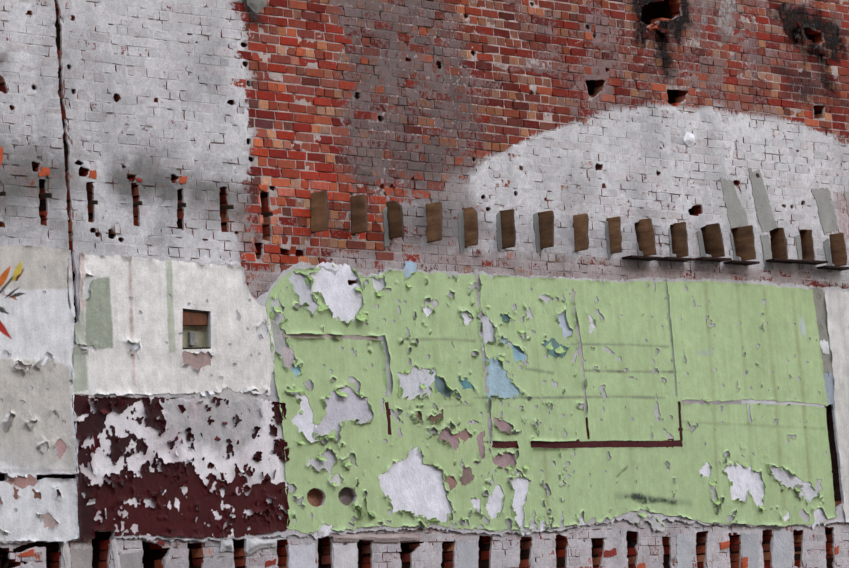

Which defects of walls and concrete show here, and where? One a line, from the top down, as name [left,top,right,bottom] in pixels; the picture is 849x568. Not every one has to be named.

spalling [641,0,680,31]
damp [653,23,674,78]
damp [791,24,836,91]
spalling [667,90,681,104]
crack [55,8,77,323]
peeling [288,262,368,328]
peeling [397,365,475,401]
peeling [461,307,526,434]
peeling [73,290,375,546]
peeling [378,446,474,529]
peeling [414,409,564,536]
peeling [724,461,827,529]